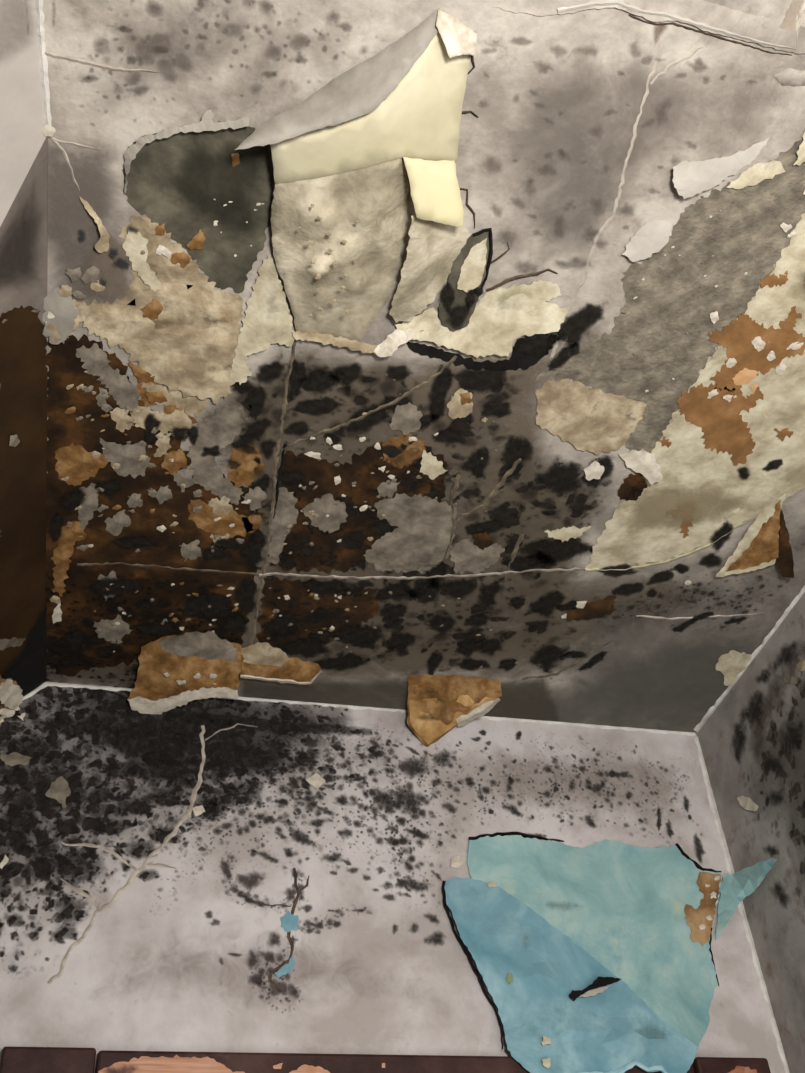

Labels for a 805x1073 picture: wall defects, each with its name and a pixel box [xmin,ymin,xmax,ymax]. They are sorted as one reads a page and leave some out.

leakage [96,0,337,99]
peeling [672,138,786,199]
peeling [622,219,672,262]
peeling [9,434,20,447]
leakage [0,304,805,972]
peeling [0,675,25,724]
crack [47,723,257,984]
leakage [220,933,298,1013]
crack [227,856,366,998]
peeling [442,832,778,1073]
spalling [98,1055,245,1073]
spalling [273,1063,330,1073]